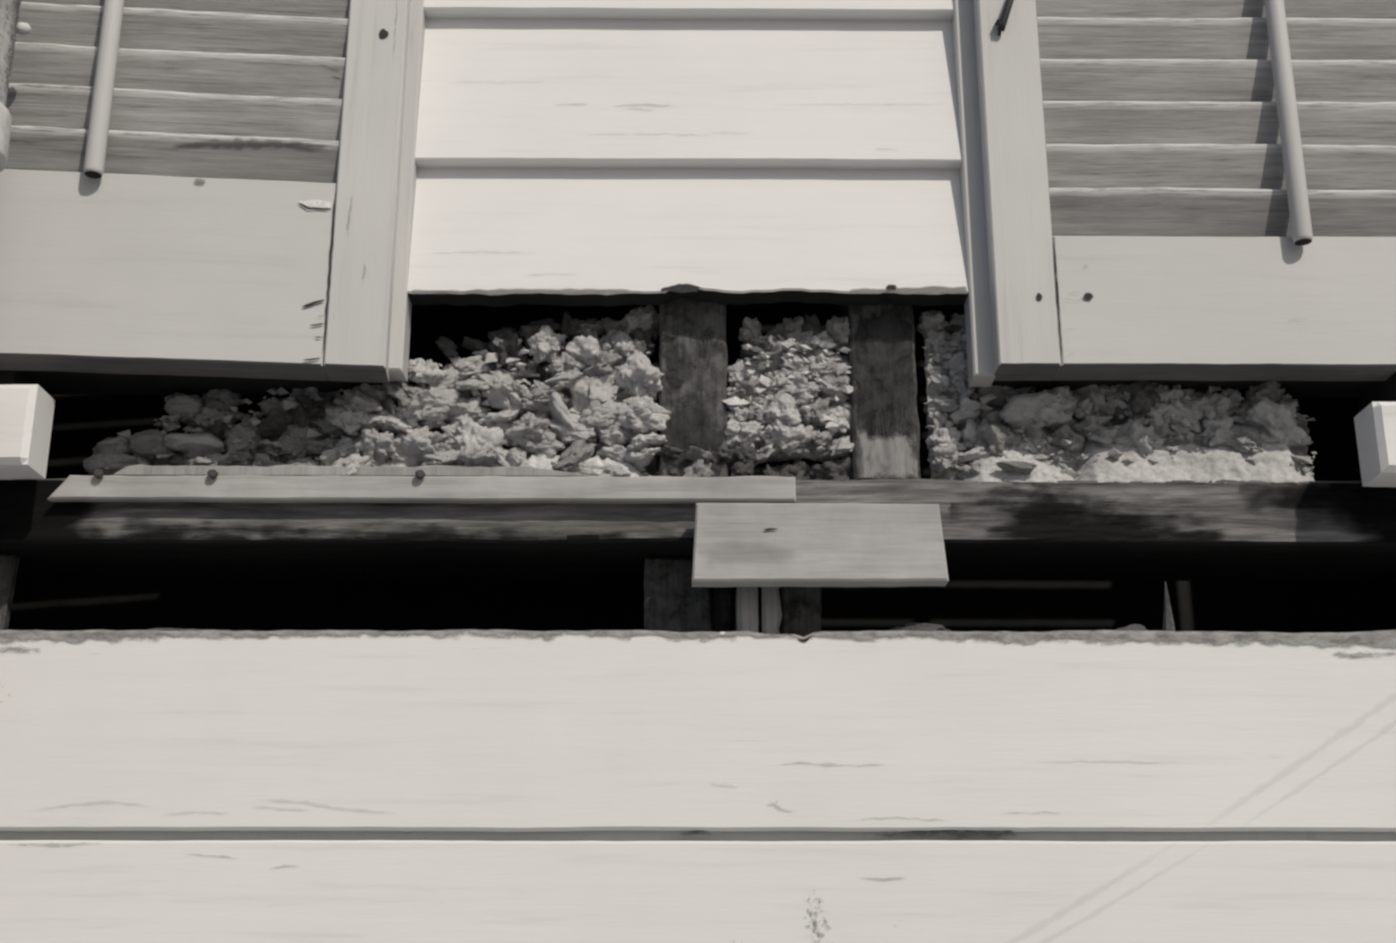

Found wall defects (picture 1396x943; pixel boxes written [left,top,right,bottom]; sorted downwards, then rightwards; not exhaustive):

spalling [996,461,1038,473]
water stain [951,484,1222,542]
peeling [0,629,1396,658]